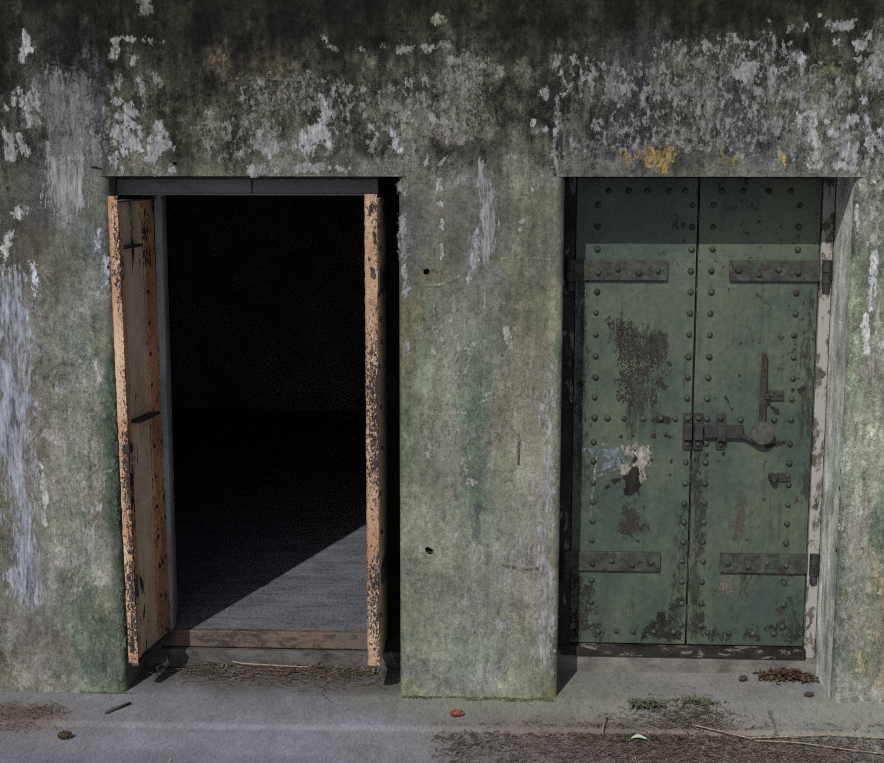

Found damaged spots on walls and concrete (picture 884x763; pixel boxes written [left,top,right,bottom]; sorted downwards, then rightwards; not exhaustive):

peeling [18,29,36,64]
peeling [108,36,165,59]
peeling [1,86,42,163]
peeling [91,70,176,177]
damp [0,260,50,613]
corrosion [571,280,595,508]
corrosion [604,449,651,544]
peeling [620,442,652,483]
corrosion [605,312,673,439]
corrosion [641,449,730,643]
corrosion [791,287,814,438]
corrosion [569,571,605,642]